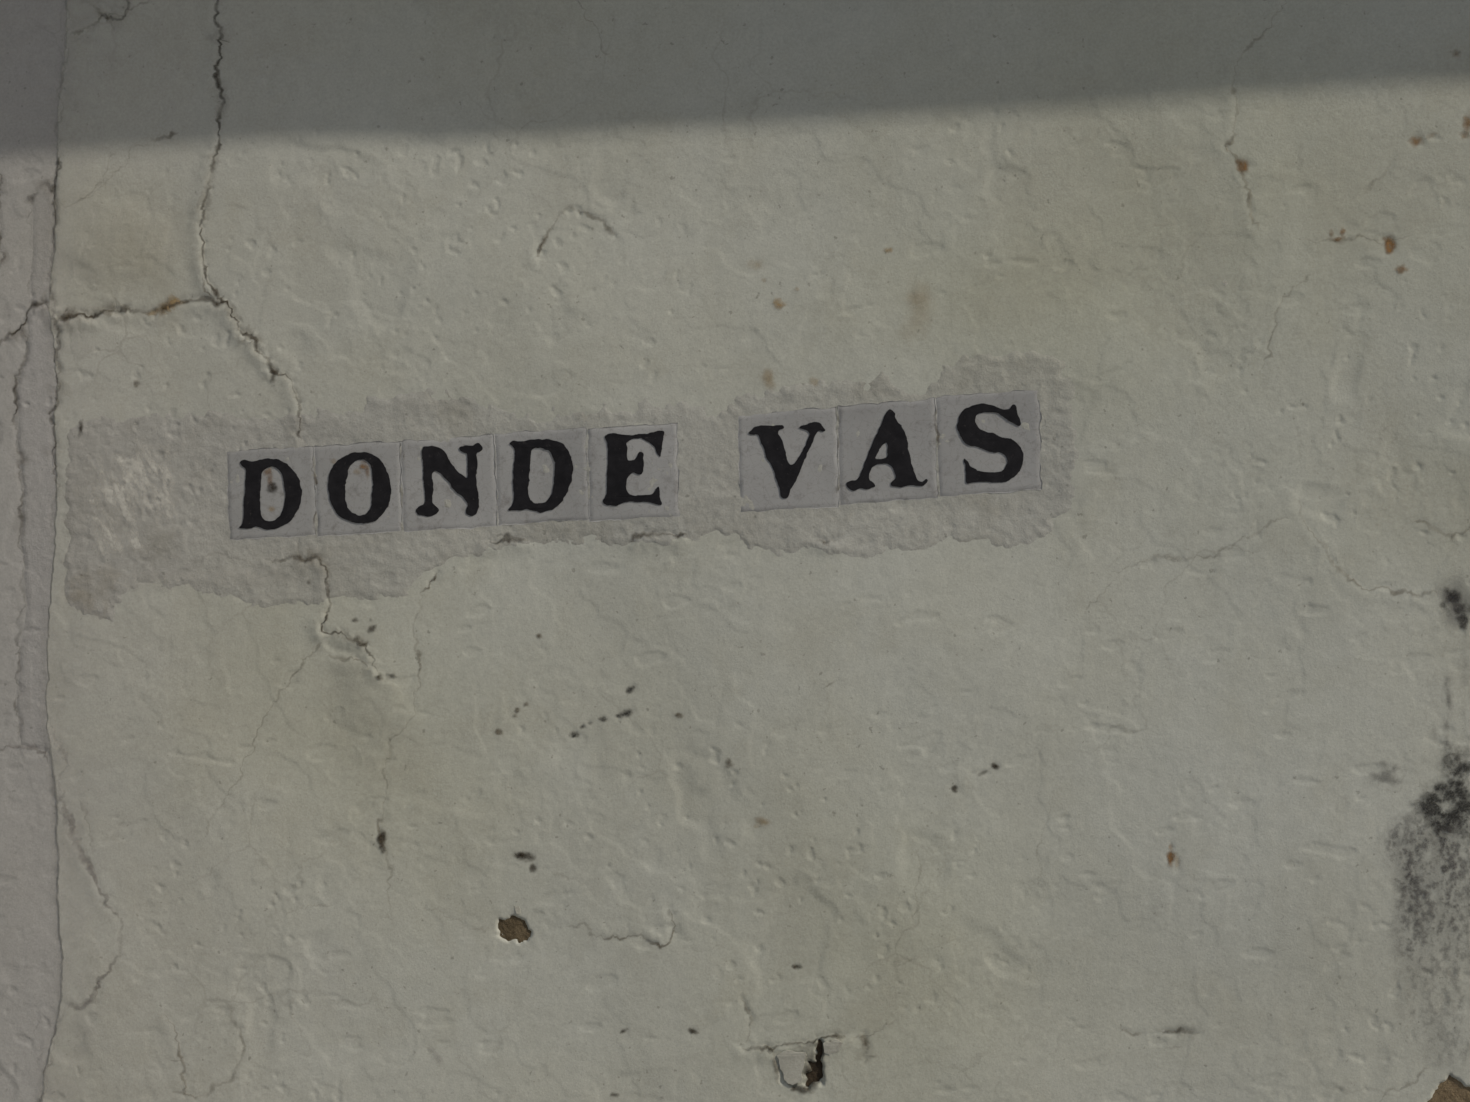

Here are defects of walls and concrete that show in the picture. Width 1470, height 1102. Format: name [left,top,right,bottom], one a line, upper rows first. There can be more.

crack [214,13,223,146]
crack [12,229,287,377]
leakage [1448,591,1468,628]
leakage [1396,753,1470,928]
spalling [777,1039,843,1087]
spalling [1427,1075,1470,1102]